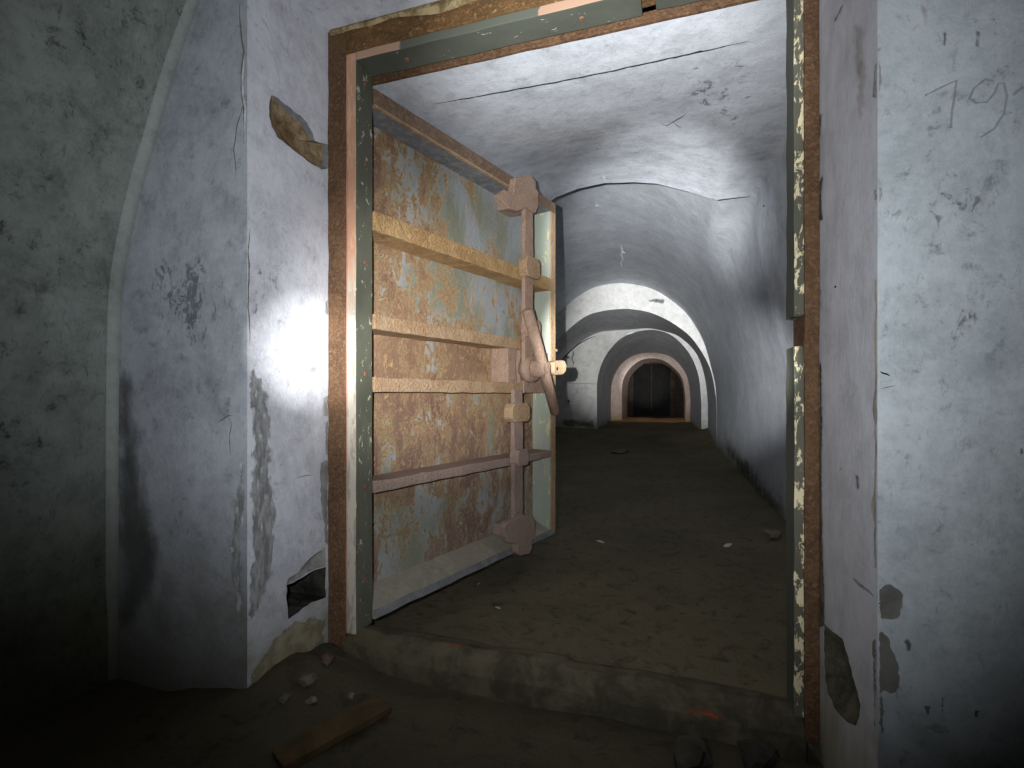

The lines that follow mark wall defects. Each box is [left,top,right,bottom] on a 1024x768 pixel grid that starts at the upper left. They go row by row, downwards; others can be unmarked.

crack [233,6,246,172]
crack [432,41,748,105]
crack [244,234,252,334]
leakage [121,380,153,620]
peeling [230,370,276,618]
peeling [251,396,329,684]
spalling [819,361,860,725]
peeling [860,583,903,619]